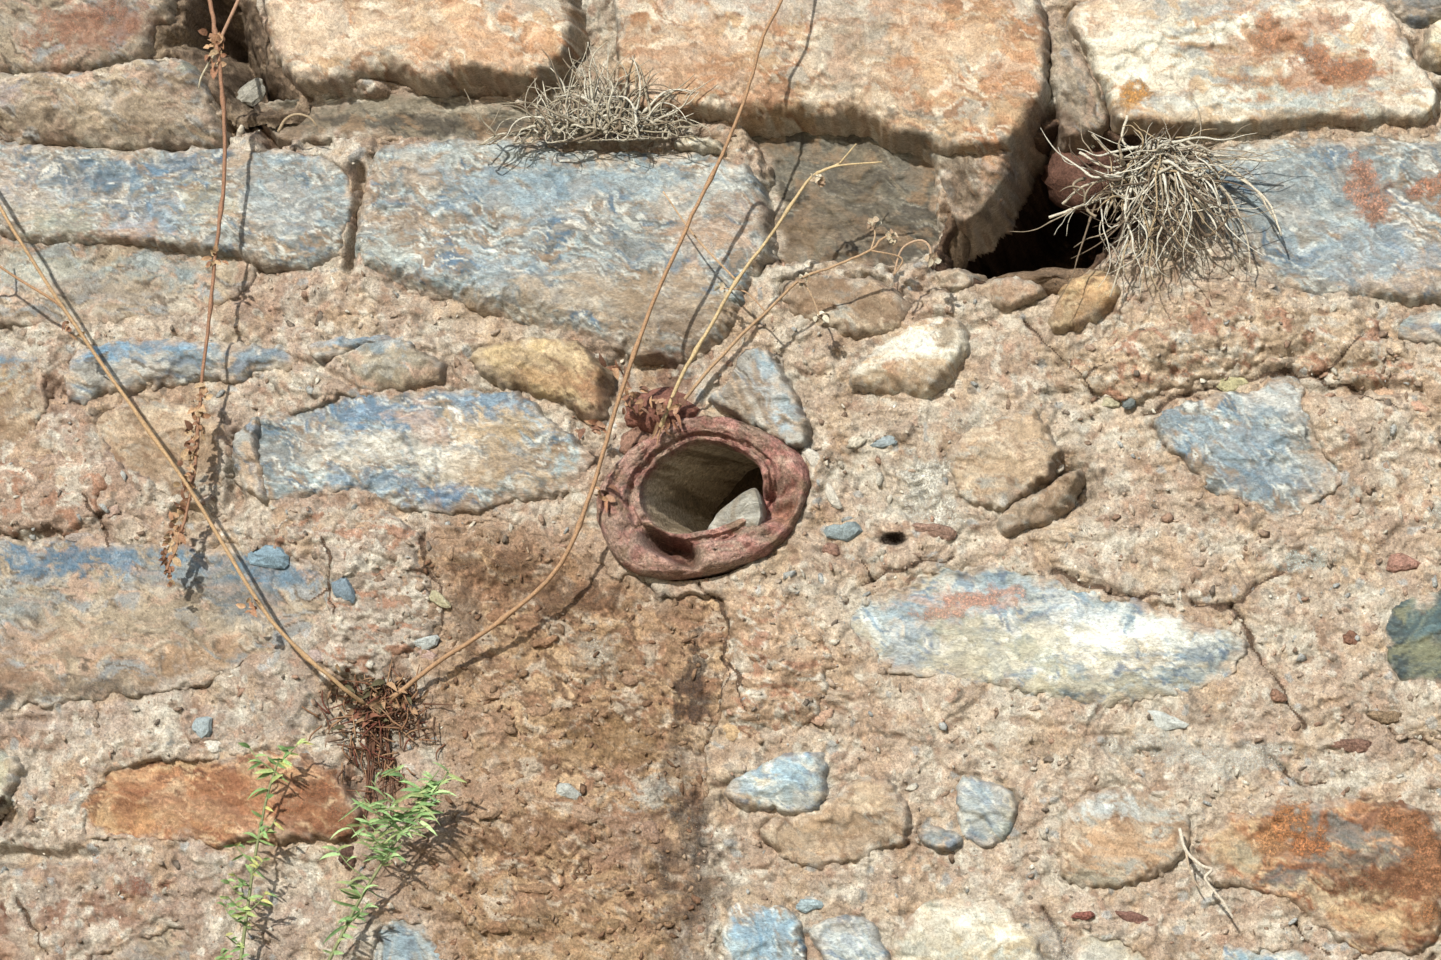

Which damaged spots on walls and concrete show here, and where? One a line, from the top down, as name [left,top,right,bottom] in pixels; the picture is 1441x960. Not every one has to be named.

water stain [451,544,627,674]
water stain [674,626,710,751]
crack [698,583,747,713]
crack [1051,568,1307,730]
crack [1268,756,1326,787]
crack [1368,711,1432,745]